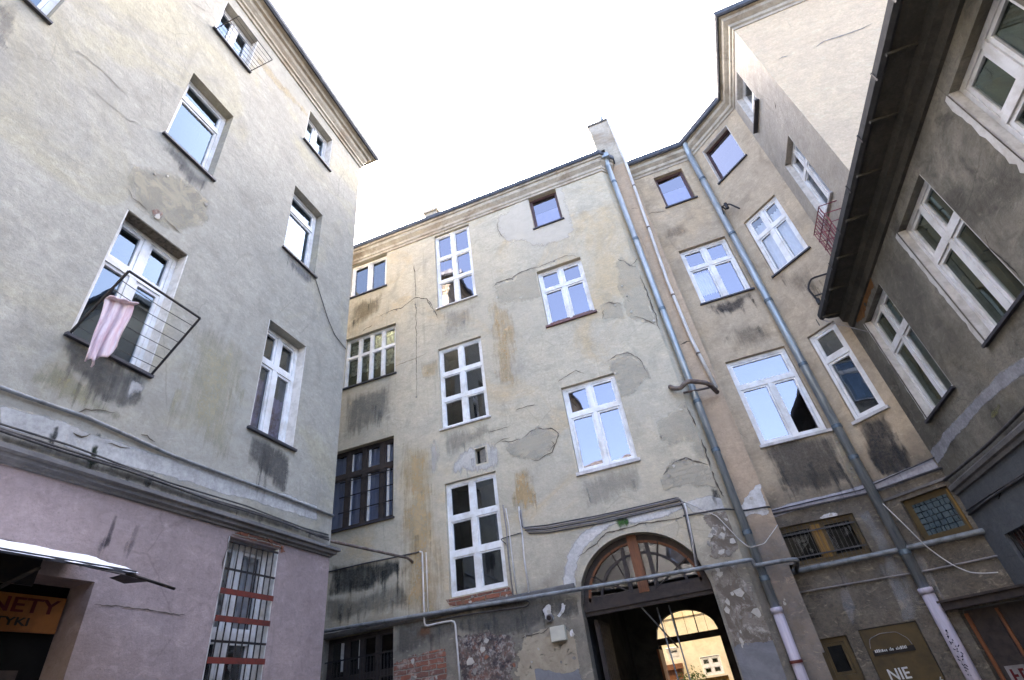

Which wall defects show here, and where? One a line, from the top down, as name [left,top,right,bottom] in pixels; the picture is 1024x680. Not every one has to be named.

crack [363,269,437,398]
flaking render [741,484,769,517]
leakage [330,561,399,596]
flaking render [703,511,772,648]
flaking render [394,628,580,680]